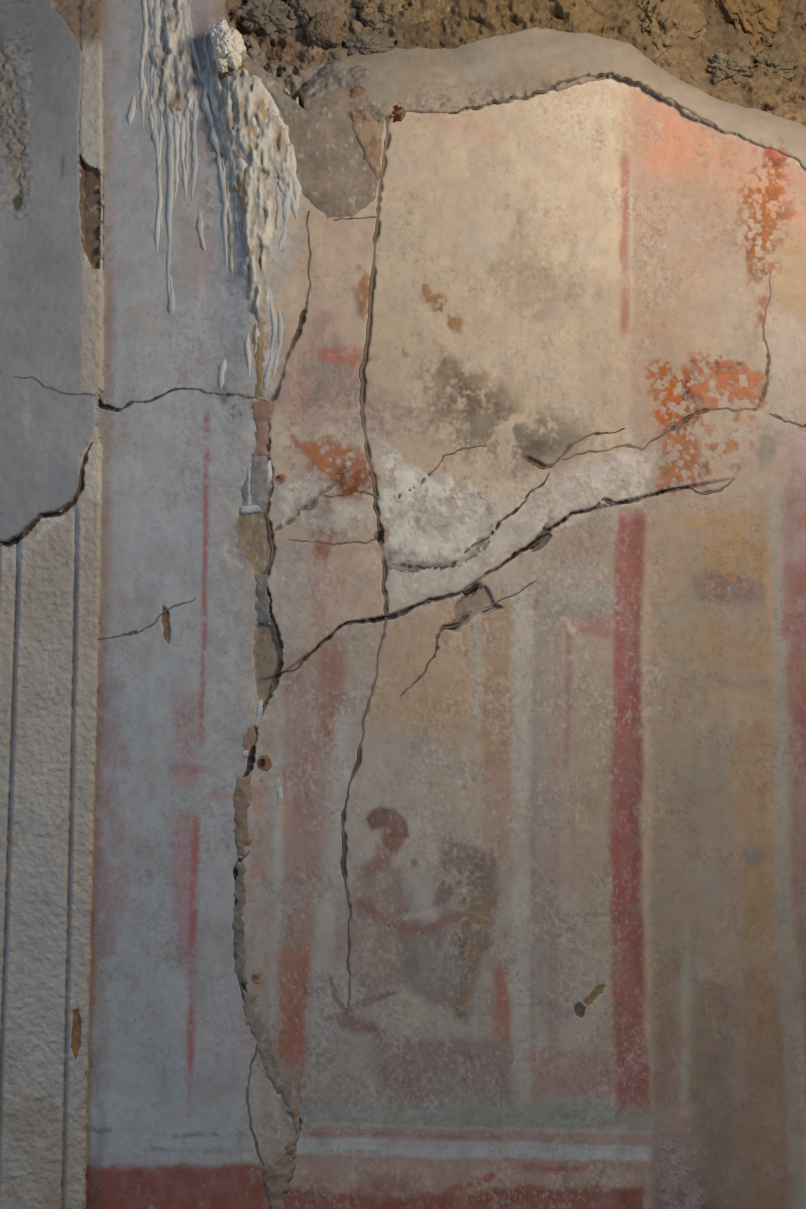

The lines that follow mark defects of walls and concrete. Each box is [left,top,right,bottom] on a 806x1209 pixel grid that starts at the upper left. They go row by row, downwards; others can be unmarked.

crack [449,72,718,127]
spalling [78,153,104,269]
damp [127,0,302,398]
crack [523,271,772,468]
crack [769,413,806,427]
crack [0,442,93,546]
crack [485,478,735,574]
crack [14,116,550,1209]